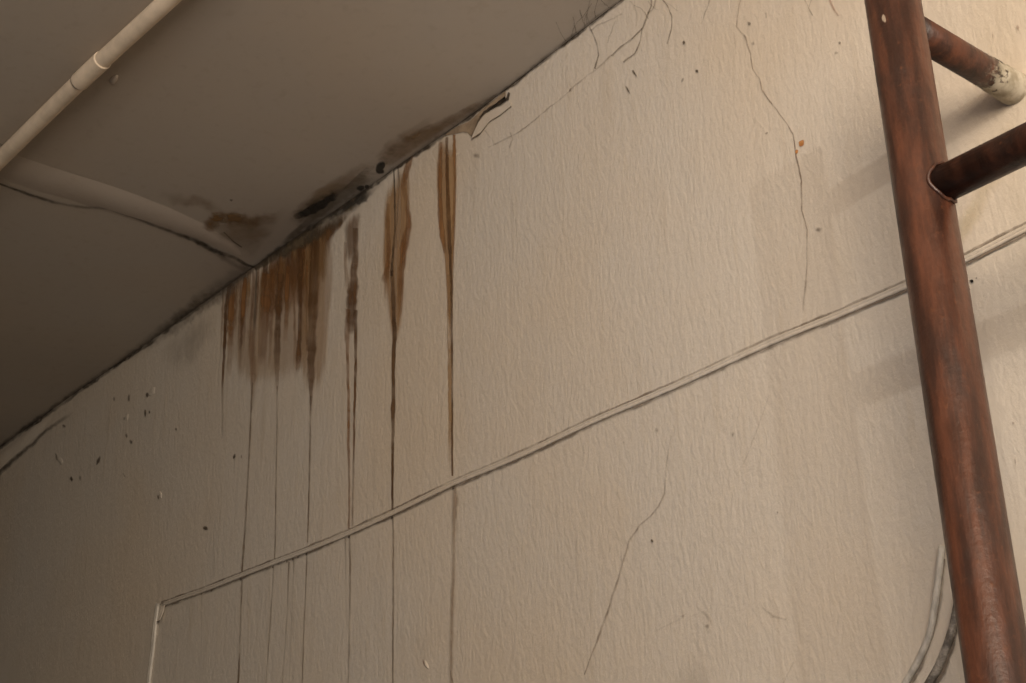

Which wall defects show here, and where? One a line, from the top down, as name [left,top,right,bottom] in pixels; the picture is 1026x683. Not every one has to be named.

crack [0,184,47,200]
crack [0,410,51,447]
corrosion [222,219,358,456]
leakage [254,185,369,270]
crack [72,0,623,397]
corrosion [384,156,413,509]
corrosion [438,135,456,476]
crack [751,62,804,187]